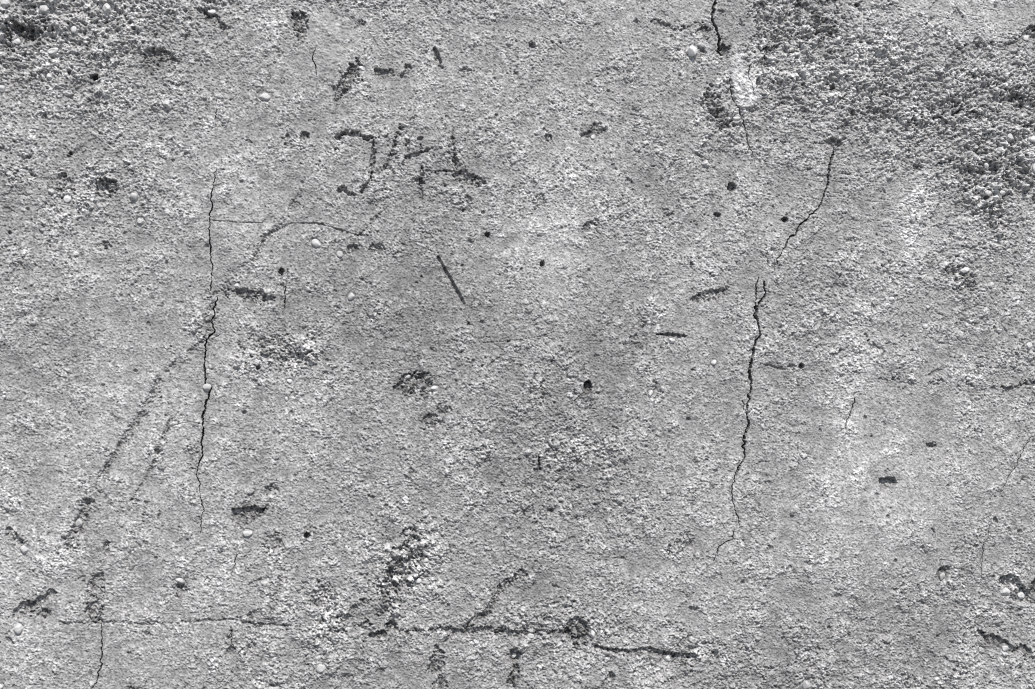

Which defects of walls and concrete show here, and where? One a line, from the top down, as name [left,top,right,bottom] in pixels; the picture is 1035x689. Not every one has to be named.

crack [709,0,757,167]
crack [171,167,244,535]
crack [712,147,836,563]